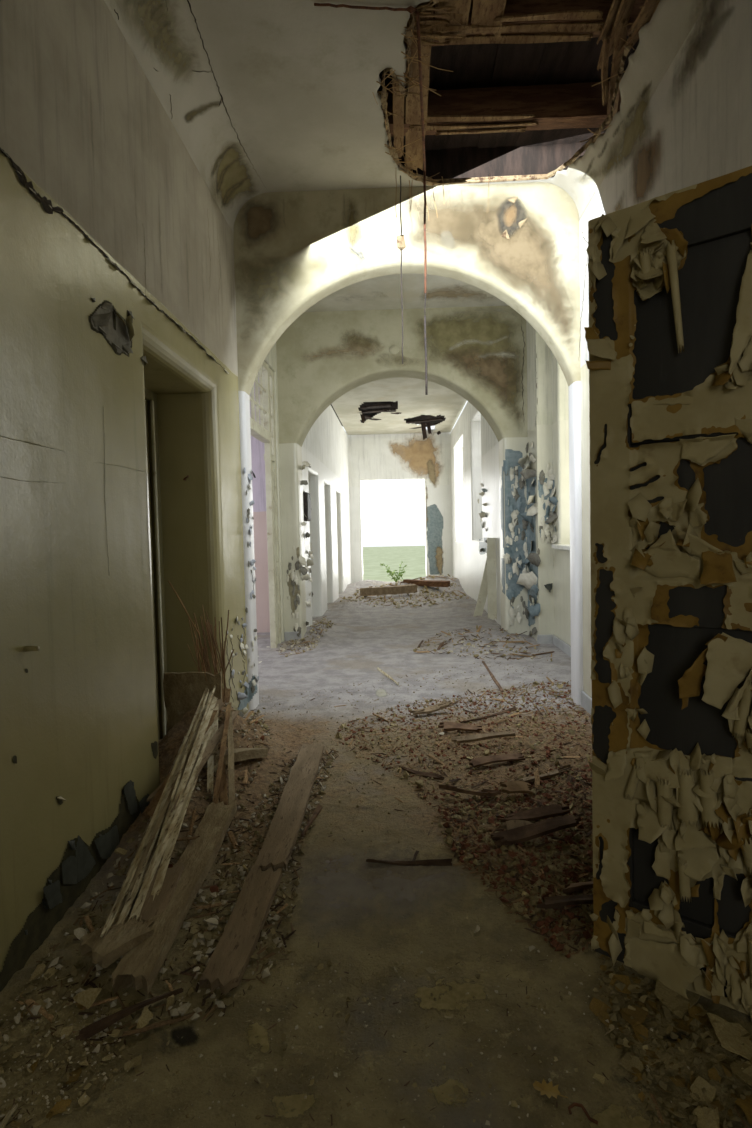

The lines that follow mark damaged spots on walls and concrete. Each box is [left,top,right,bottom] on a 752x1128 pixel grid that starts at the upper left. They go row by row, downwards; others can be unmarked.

leakage [125,0,190,75]
leakage [186,103,219,122]
leakage [588,86,649,173]
leakage [212,147,277,242]
peeling [0,148,229,374]
leakage [420,314,519,414]
peeling [584,327,617,370]
peeling [714,250,752,381]
peeling [286,513,314,637]
peeling [478,442,558,636]
peeling [677,633,752,730]
peeling [0,780,150,992]